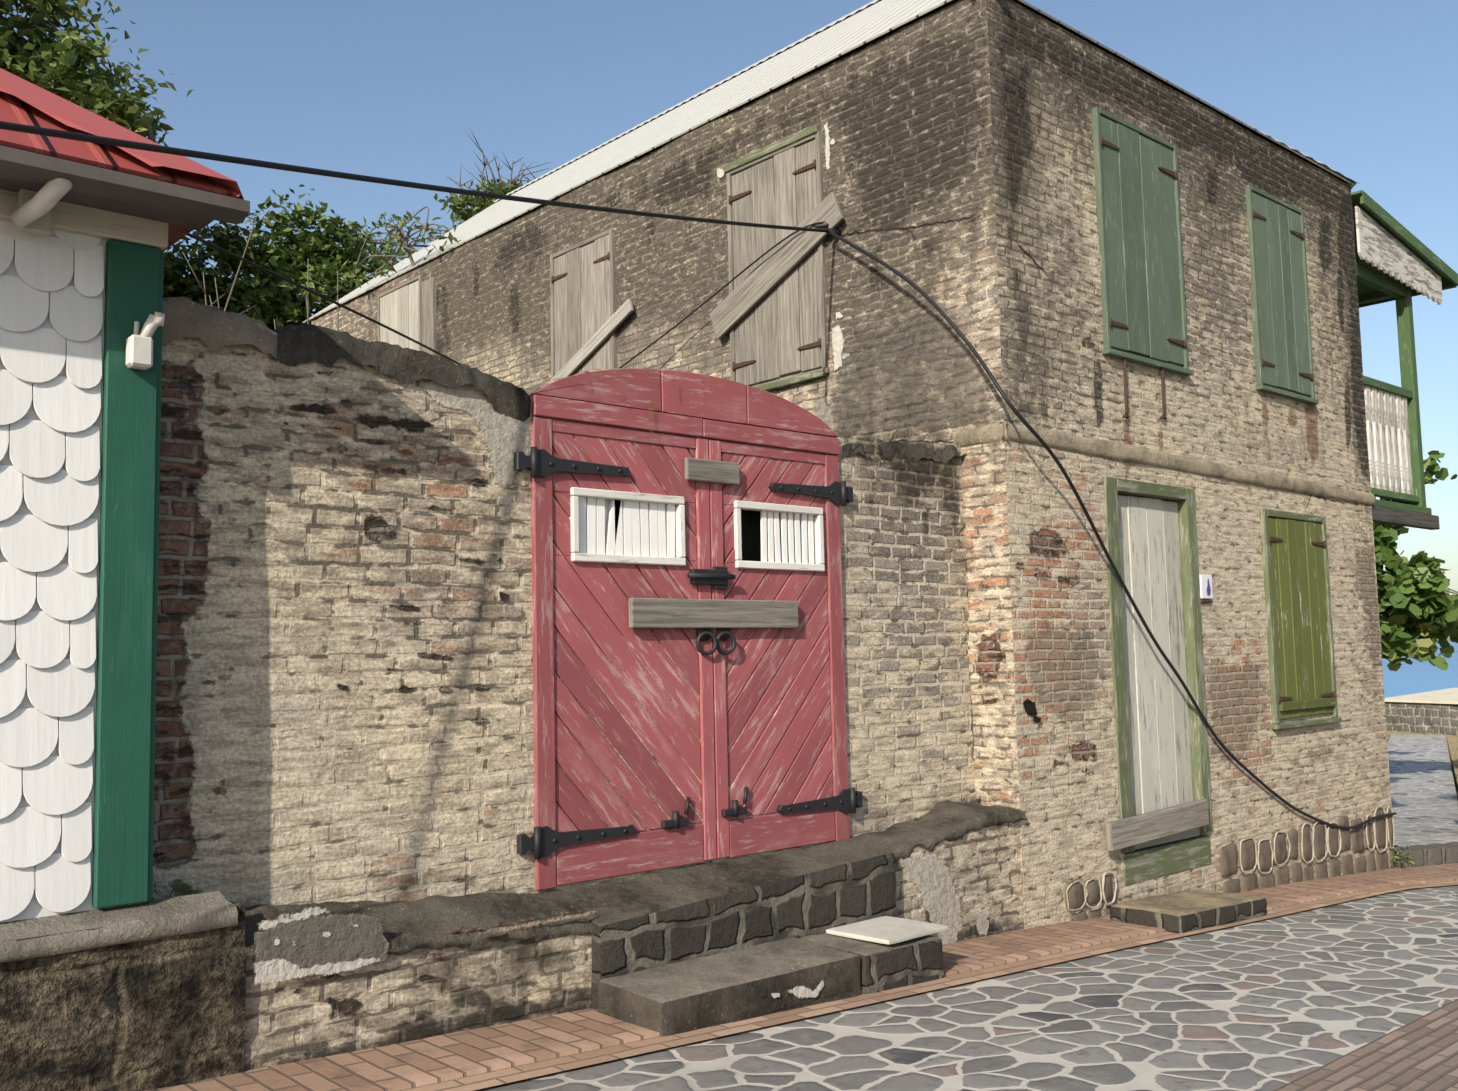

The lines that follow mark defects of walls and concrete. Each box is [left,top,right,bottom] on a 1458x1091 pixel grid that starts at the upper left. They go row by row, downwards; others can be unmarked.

water stain [436,285,450,357]
water stain [473,223,546,332]
water stain [603,8,1371,482]
spalling [1016,524,1079,586]
spalling [153,360,230,870]
spalling [975,629,1005,705]
spalling [1023,699,1041,723]
spalling [1054,740,1097,774]
flaking render [903,840,989,945]
peeling [254,907,380,1020]